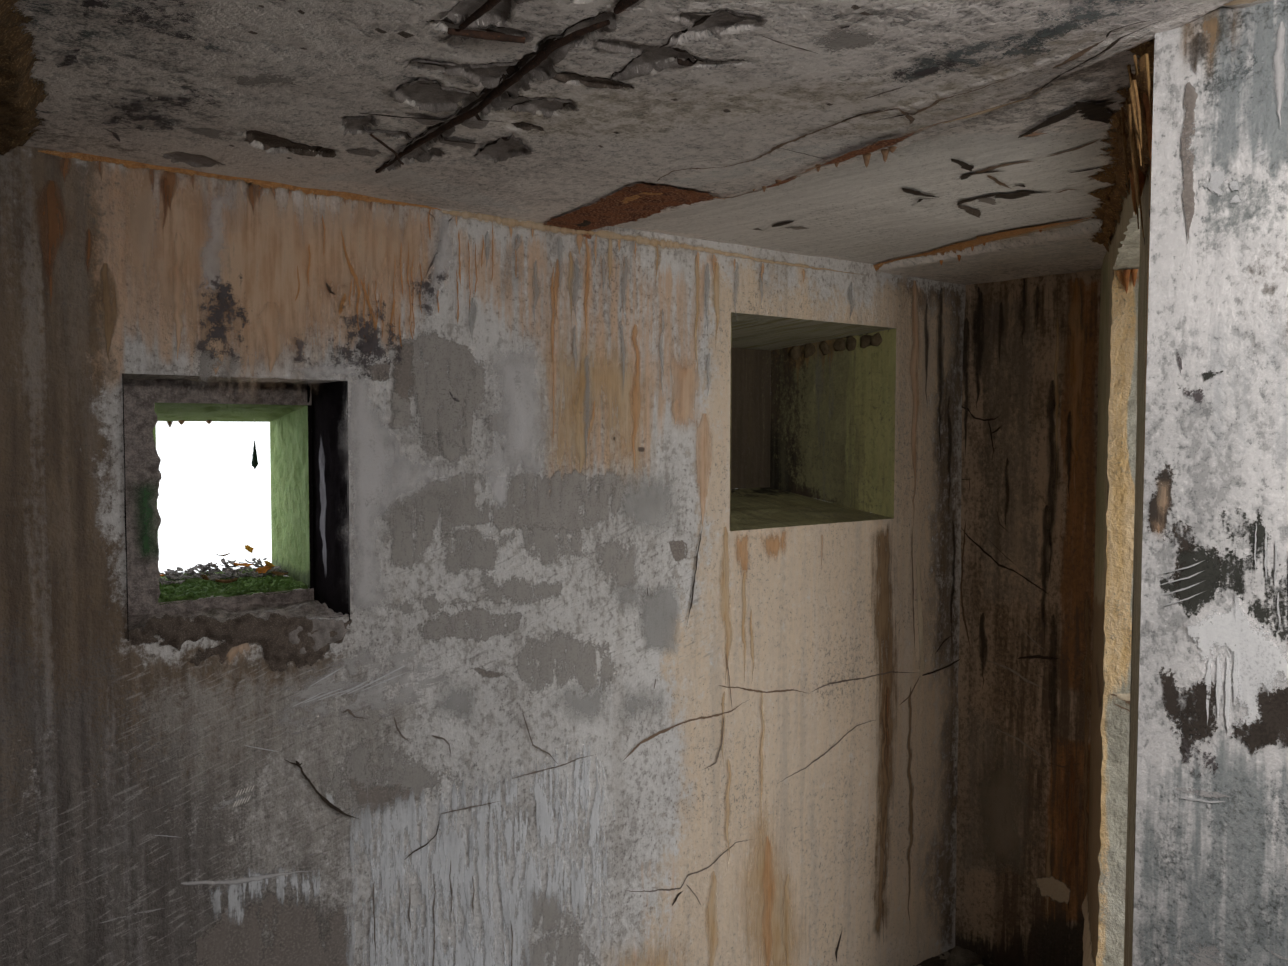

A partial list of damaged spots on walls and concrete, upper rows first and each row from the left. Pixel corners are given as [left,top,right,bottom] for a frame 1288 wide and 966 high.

spalling [183,0,767,173]
corrosion [0,0,1155,474]
water stain [1180,16,1285,244]
water stain [1177,349,1223,403]
peeling [368,332,678,716]
water stain [1147,464,1195,557]
spalling [124,613,352,672]
crack [284,759,361,820]
crack [625,840,748,907]
crack [404,512,1059,860]
corrosion [708,527,795,966]
peeling [1157,508,1288,778]